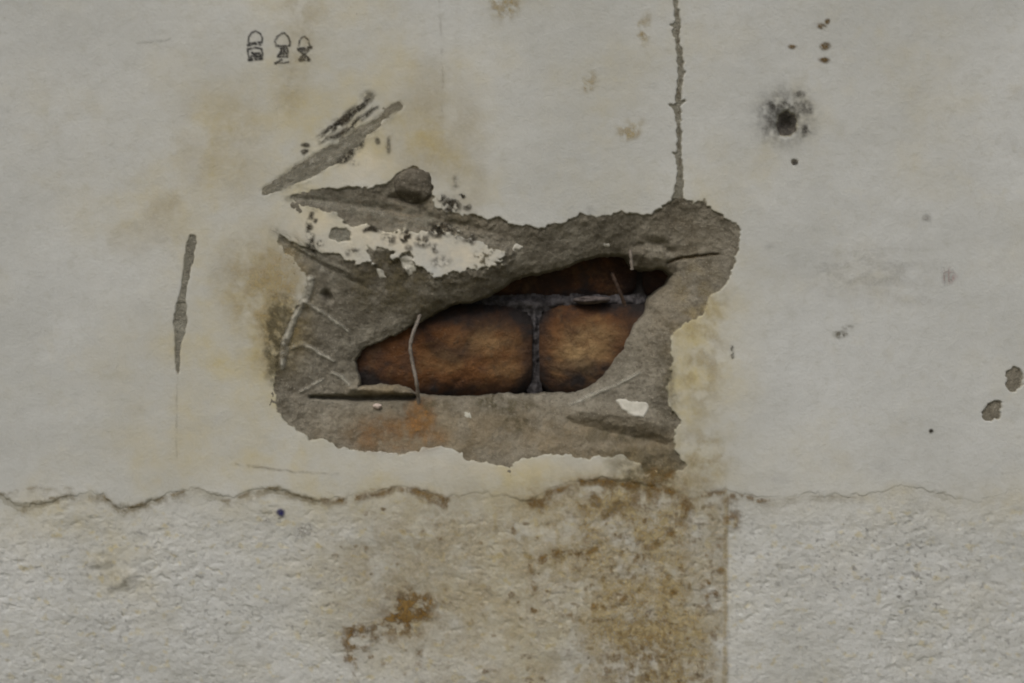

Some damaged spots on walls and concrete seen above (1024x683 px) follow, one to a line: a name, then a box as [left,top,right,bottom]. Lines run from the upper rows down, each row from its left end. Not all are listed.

crack [669,0,686,201]
spalling [776,111,797,136]
flaking render [262,102,740,478]
peeling [982,401,1001,421]
peeling [1005,367,1023,392]
leakage [537,468,708,683]
rust [344,593,433,661]